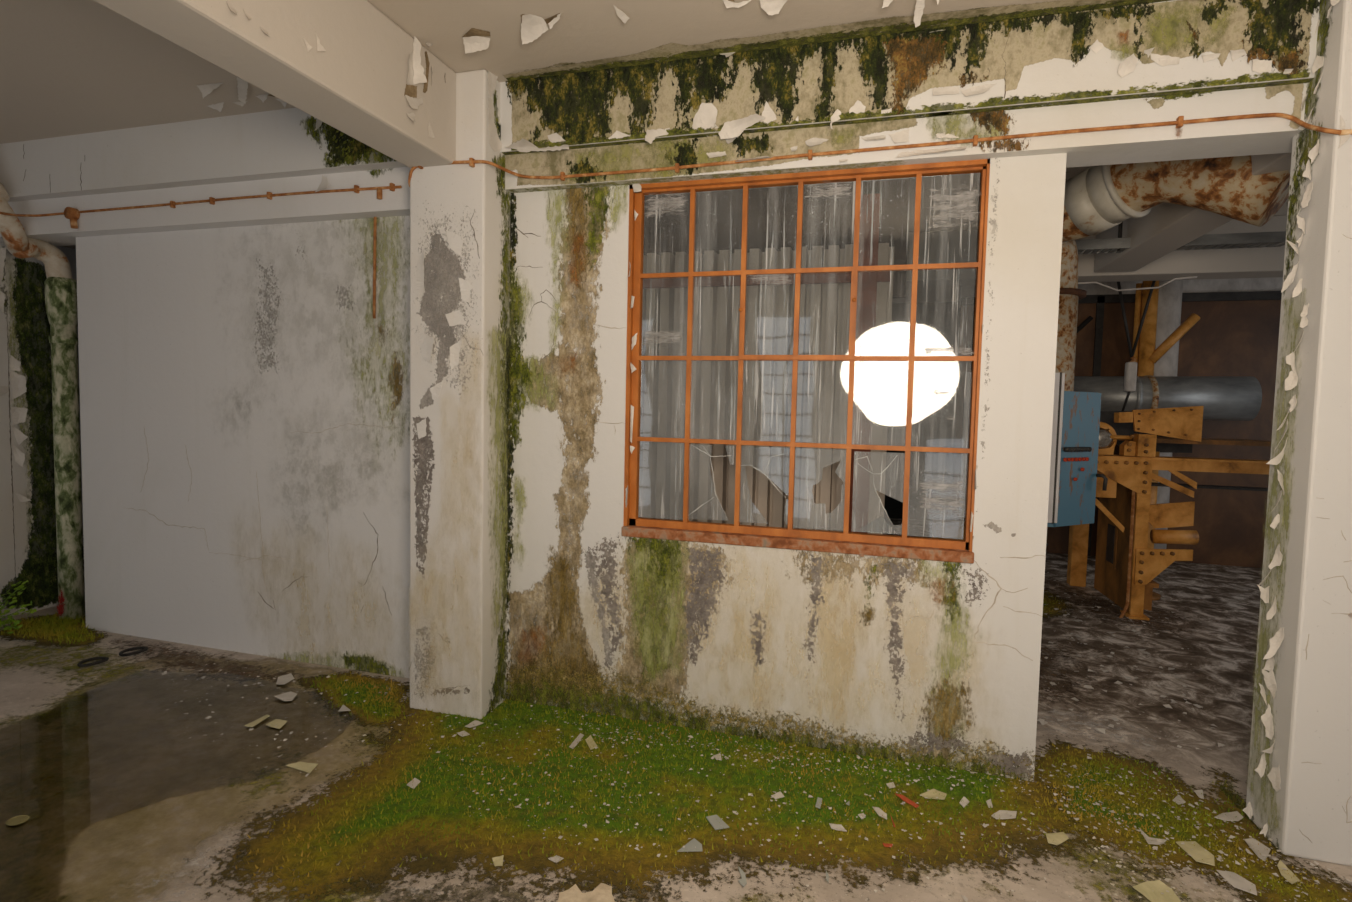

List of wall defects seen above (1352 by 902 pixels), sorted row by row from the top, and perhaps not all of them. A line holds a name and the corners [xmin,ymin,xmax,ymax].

peeling [462,28,490,54]
peeling [503,0,1340,162]
leakage [340,203,479,439]
spalling [412,230,472,578]
leakage [506,547,601,705]
leakage [509,185,627,461]
spalling [508,352,734,704]
leakage [796,550,972,747]
peeling [859,554,915,722]
peeling [961,568,991,607]
peeling [1255,139,1320,792]
crack [1305,498,1352,659]